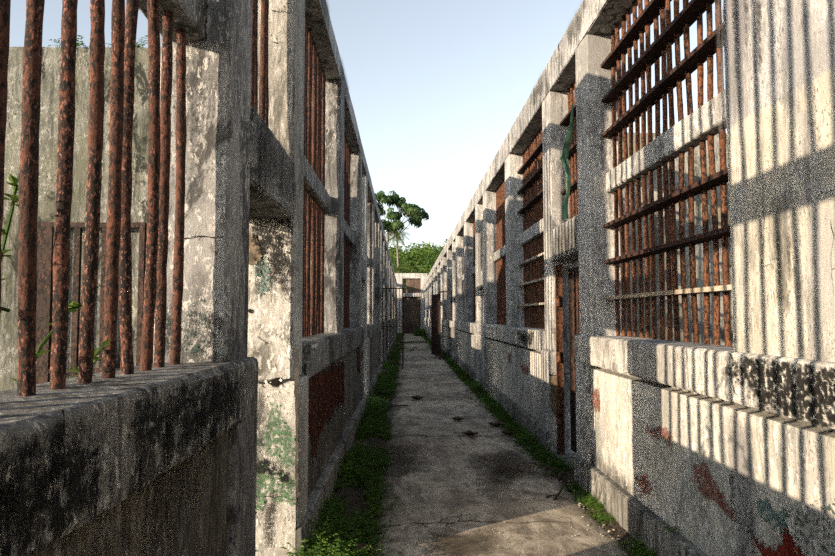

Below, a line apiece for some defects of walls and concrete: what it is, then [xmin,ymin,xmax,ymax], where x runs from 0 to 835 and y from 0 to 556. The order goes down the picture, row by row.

damp [250,122,299,305]
damp [773,202,789,303]
mould [0,417,114,556]
mould [119,371,242,492]
peeling [256,345,345,512]
peeling [635,471,652,495]
peeling [645,425,672,450]
peeling [692,458,738,524]
damp [721,356,835,430]
peeling [751,495,835,556]